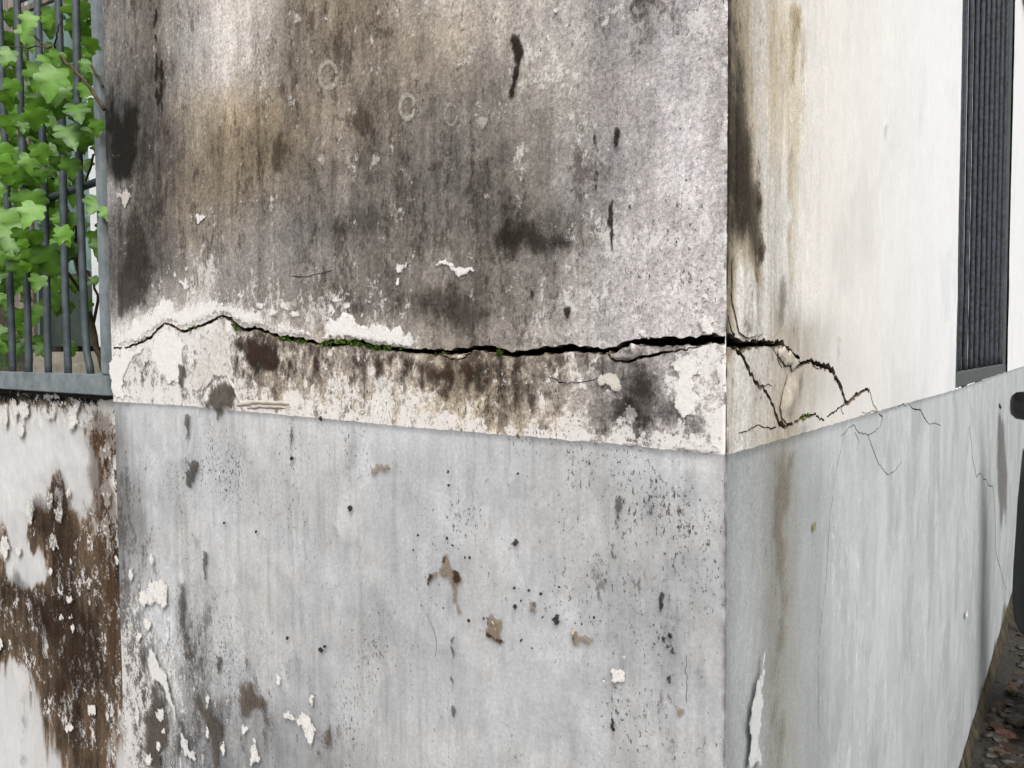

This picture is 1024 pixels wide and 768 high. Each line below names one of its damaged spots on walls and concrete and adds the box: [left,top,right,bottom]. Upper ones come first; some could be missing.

leakage [733,18,766,262]
peeling [0,266,413,419]
leakage [236,336,290,378]
leakage [352,354,492,400]
peeling [597,372,622,392]
flaking render [613,329,650,360]
peeling [671,354,702,419]
leakage [25,488,70,525]
crack [115,315,941,730]
leakage [57,587,75,633]
spalling [134,579,196,768]
spalling [225,658,340,766]